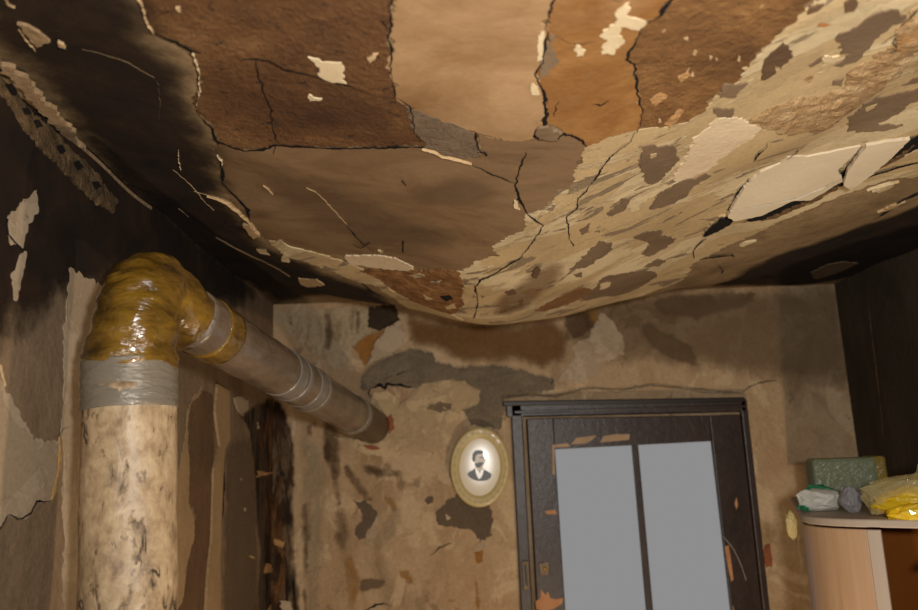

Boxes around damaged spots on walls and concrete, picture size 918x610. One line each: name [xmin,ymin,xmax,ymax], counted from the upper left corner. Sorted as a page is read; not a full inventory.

peeling [5,190,39,301]
crack [82,49,161,110]
flaking render [137,0,484,159]
crack [130,0,587,318]
crack [566,0,673,246]
peeling [599,2,647,55]
spalling [638,6,918,257]
crack [825,193,918,248]
crack [867,163,918,179]
peeling [0,267,102,610]
peeling [177,387,215,610]
peeling [425,494,493,563]